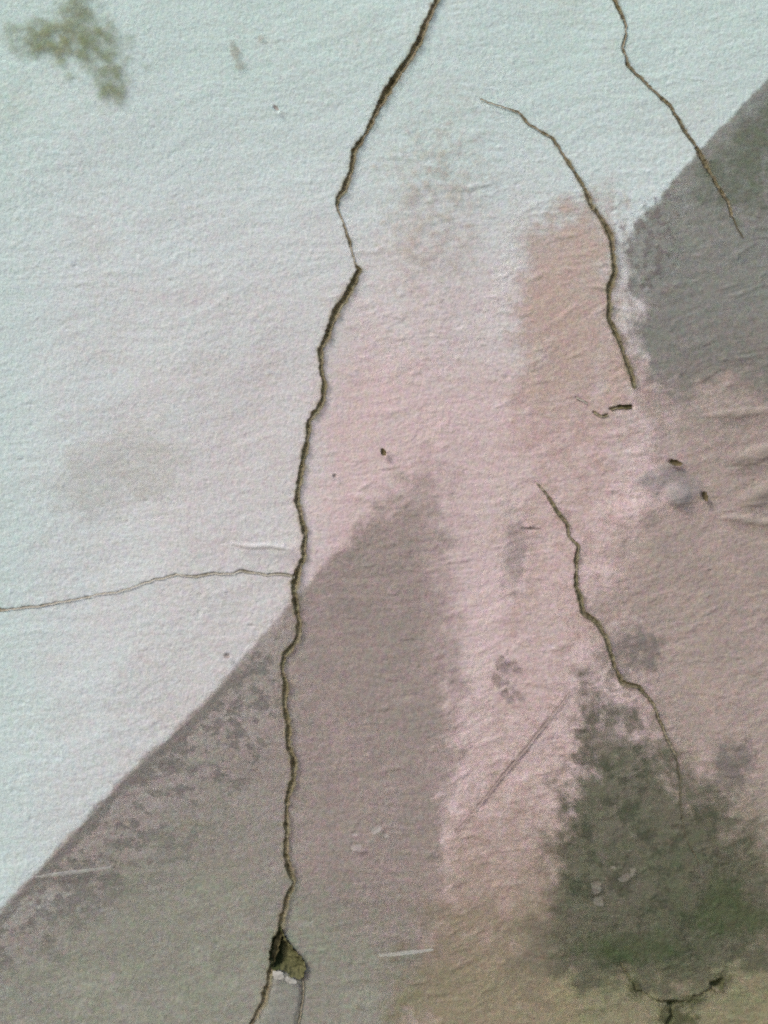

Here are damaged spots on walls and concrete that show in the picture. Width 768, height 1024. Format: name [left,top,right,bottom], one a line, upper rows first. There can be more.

mould [25,0,124,95]
crack [480,98,637,417]
crack [613,0,744,238]
water stain [620,80,768,386]
crack [0,0,440,1024]
water stain [0,510,449,1024]
crack [536,482,699,866]
spalling [269,926,306,984]